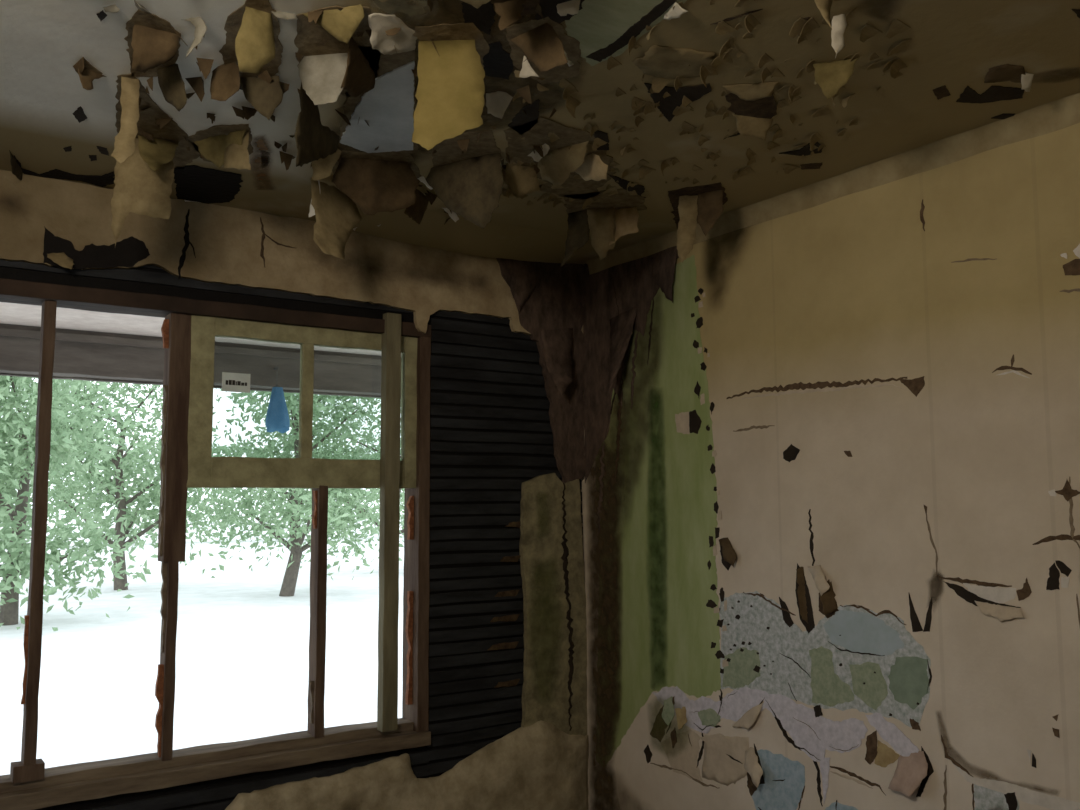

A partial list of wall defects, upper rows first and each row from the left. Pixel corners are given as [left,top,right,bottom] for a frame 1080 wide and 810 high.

peeling [0,0,912,314]
crack [178,209,196,280]
crack [260,217,295,268]
crack [727,376,925,399]
flaking render [83,310,562,810]
leakage [539,483,574,731]
leakage [588,318,666,810]
peeling [707,487,737,570]
peeling [779,563,839,633]
crack [807,509,815,566]
peeling [909,575,941,632]
crack [1032,477,1080,549]